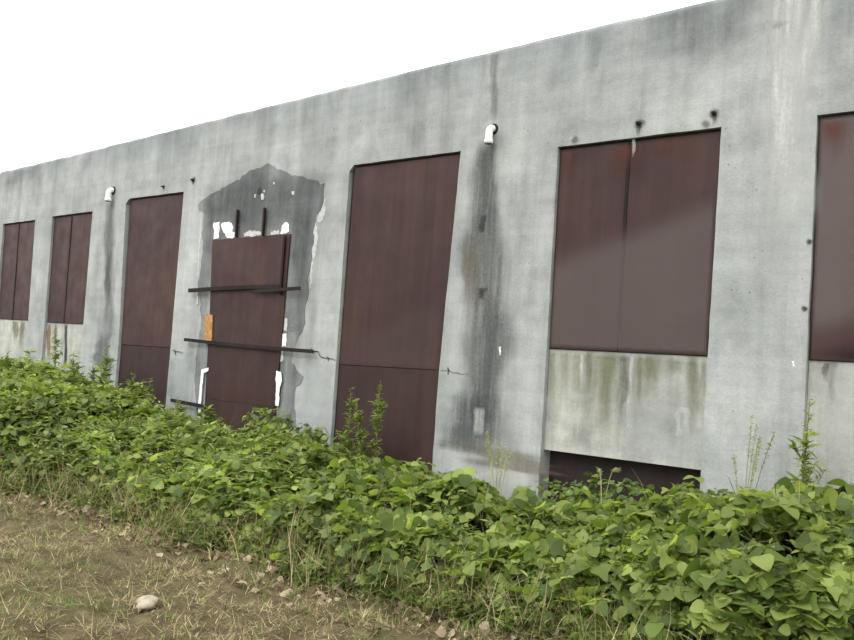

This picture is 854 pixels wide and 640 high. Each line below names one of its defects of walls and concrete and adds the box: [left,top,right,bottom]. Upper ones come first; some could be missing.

peeling [213,222,289,239]
spalling [309,198,326,288]
damp [453,146,505,467]
peeling [198,368,209,418]
peeling [275,318,288,406]